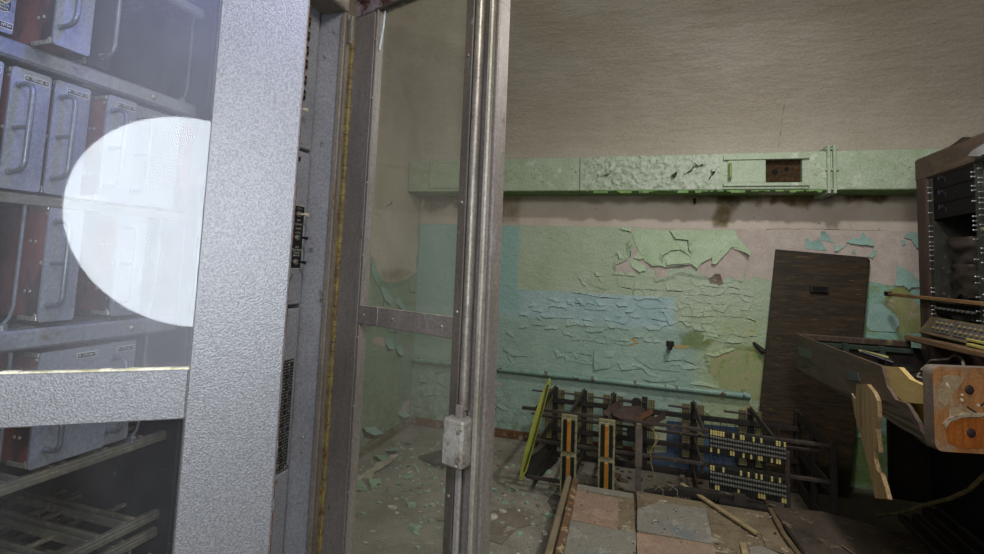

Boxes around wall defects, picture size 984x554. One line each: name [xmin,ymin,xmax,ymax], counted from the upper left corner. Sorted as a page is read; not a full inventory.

peeling [503,228,921,419]